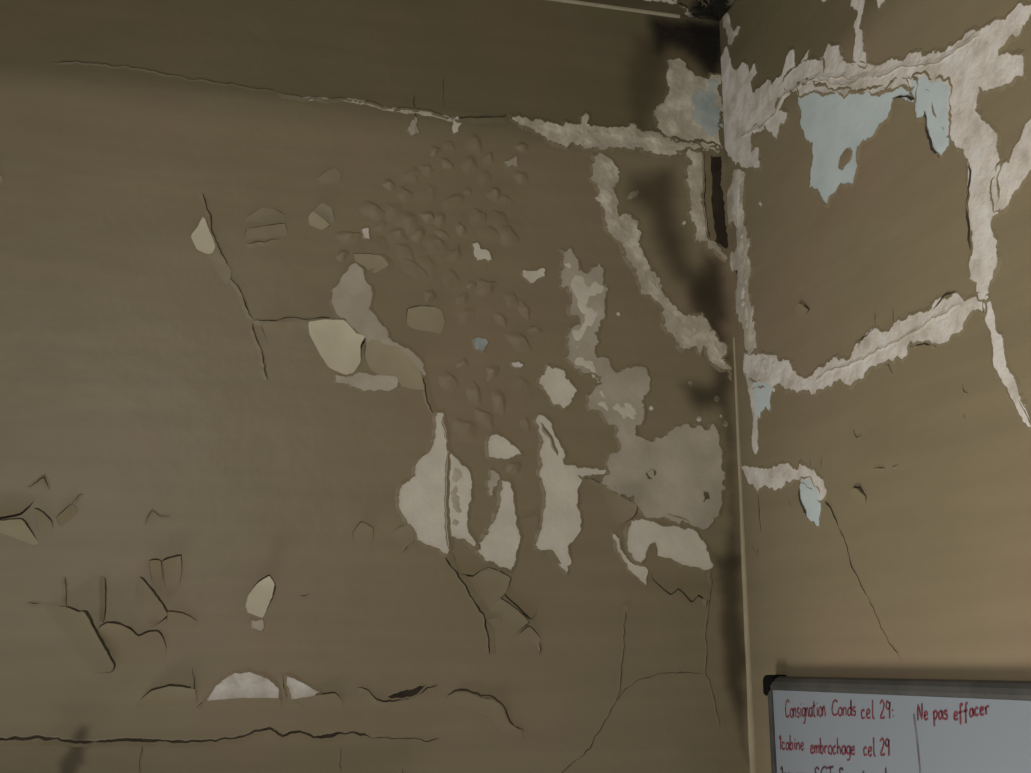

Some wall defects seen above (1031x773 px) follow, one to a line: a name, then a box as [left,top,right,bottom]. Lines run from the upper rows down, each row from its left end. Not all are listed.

crack [53,59,510,137]
peeling [506,0,1031,533]
peeling [191,192,728,657]
peeling [0,473,84,545]
peeling [27,554,197,673]
crack [824,500,902,662]
crack [0,725,440,773]
peeling [137,667,343,716]
peeling [357,683,524,740]
crack [560,579,721,773]